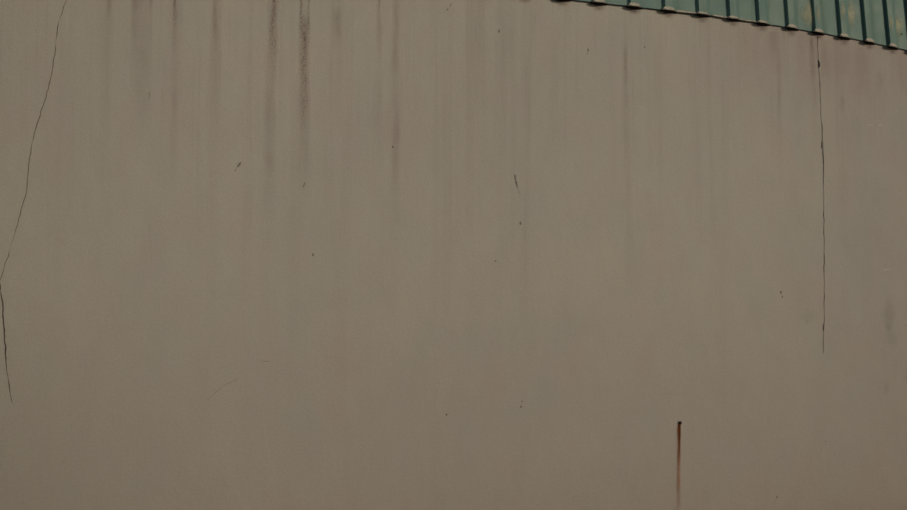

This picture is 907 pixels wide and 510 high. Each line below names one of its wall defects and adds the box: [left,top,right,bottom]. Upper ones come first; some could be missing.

crack [0,2,66,403]